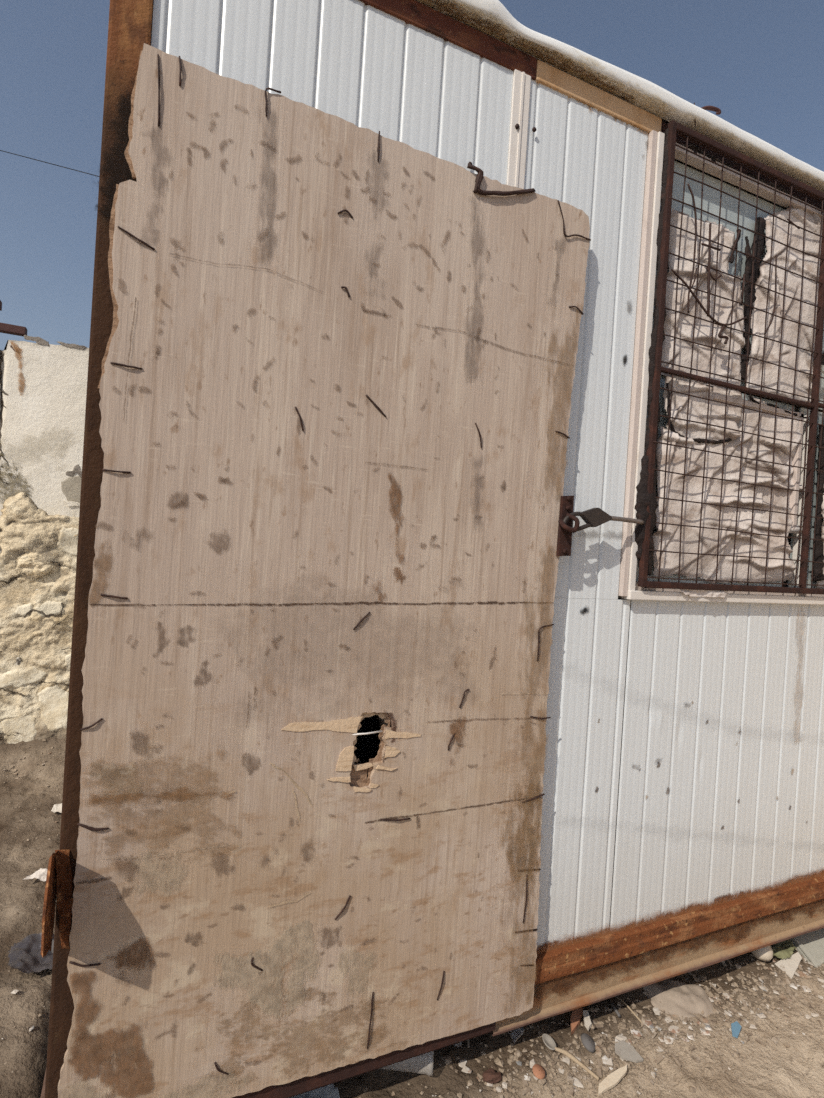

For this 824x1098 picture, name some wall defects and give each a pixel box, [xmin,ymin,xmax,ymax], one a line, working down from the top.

crack [0,345,16,483]
rust [11,341,25,394]
spalling [0,464,82,745]
rust [534,899,824,1000]
rust [536,870,824,954]